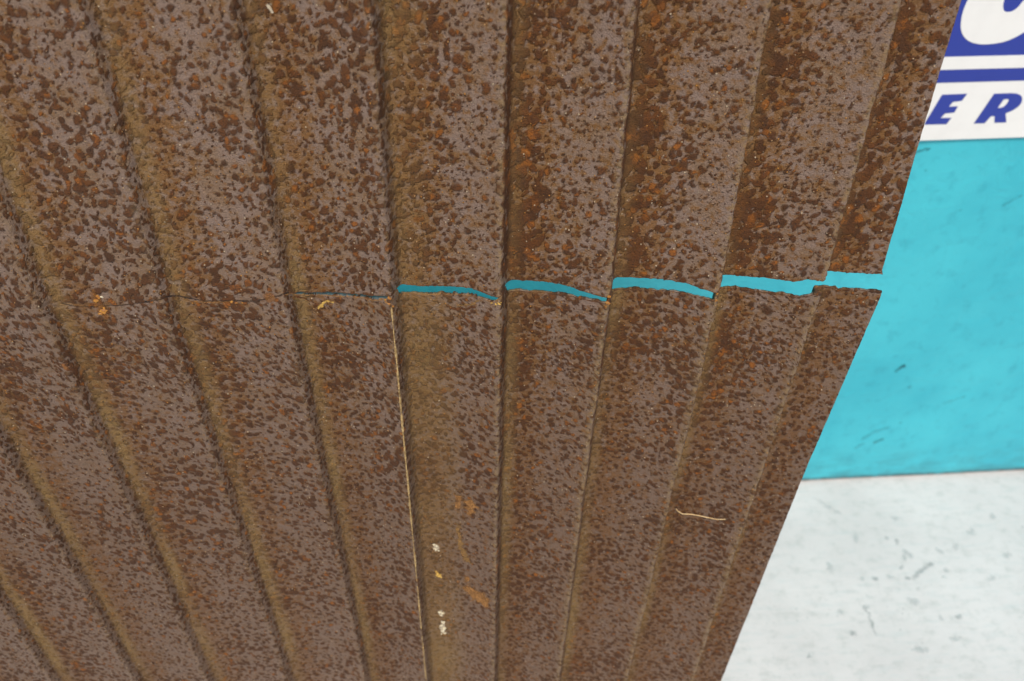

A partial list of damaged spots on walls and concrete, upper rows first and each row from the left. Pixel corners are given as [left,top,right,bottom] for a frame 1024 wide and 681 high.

crack [62,270,877,677]